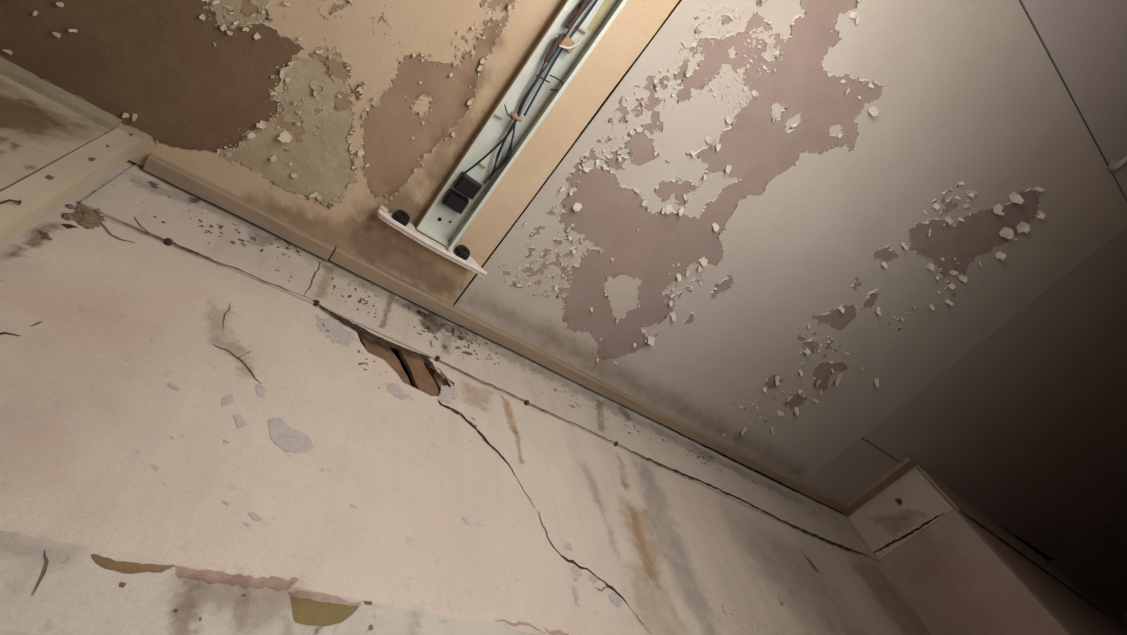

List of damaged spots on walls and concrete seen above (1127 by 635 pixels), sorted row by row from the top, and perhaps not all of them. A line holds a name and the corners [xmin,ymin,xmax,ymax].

leakage [0,98,61,127]
peeling [0,0,516,214]
crack [97,211,320,300]
leakage [149,181,301,281]
peeling [498,0,884,365]
crack [213,307,258,381]
flaking render [313,300,458,404]
leakage [316,276,513,371]
peeling [729,181,1046,435]
crack [438,360,1108,631]
crack [33,550,49,594]
spalling [288,590,372,626]